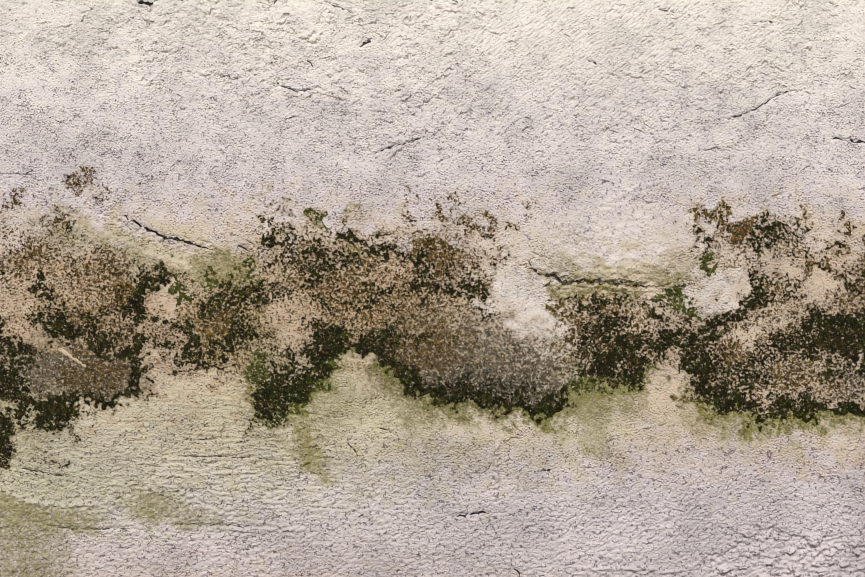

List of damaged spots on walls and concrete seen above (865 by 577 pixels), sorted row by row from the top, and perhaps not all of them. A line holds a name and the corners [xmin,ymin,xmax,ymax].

damp [61,165,109,205]
crack [120,213,213,250]
crack [524,257,668,293]
damp [0,186,865,435]